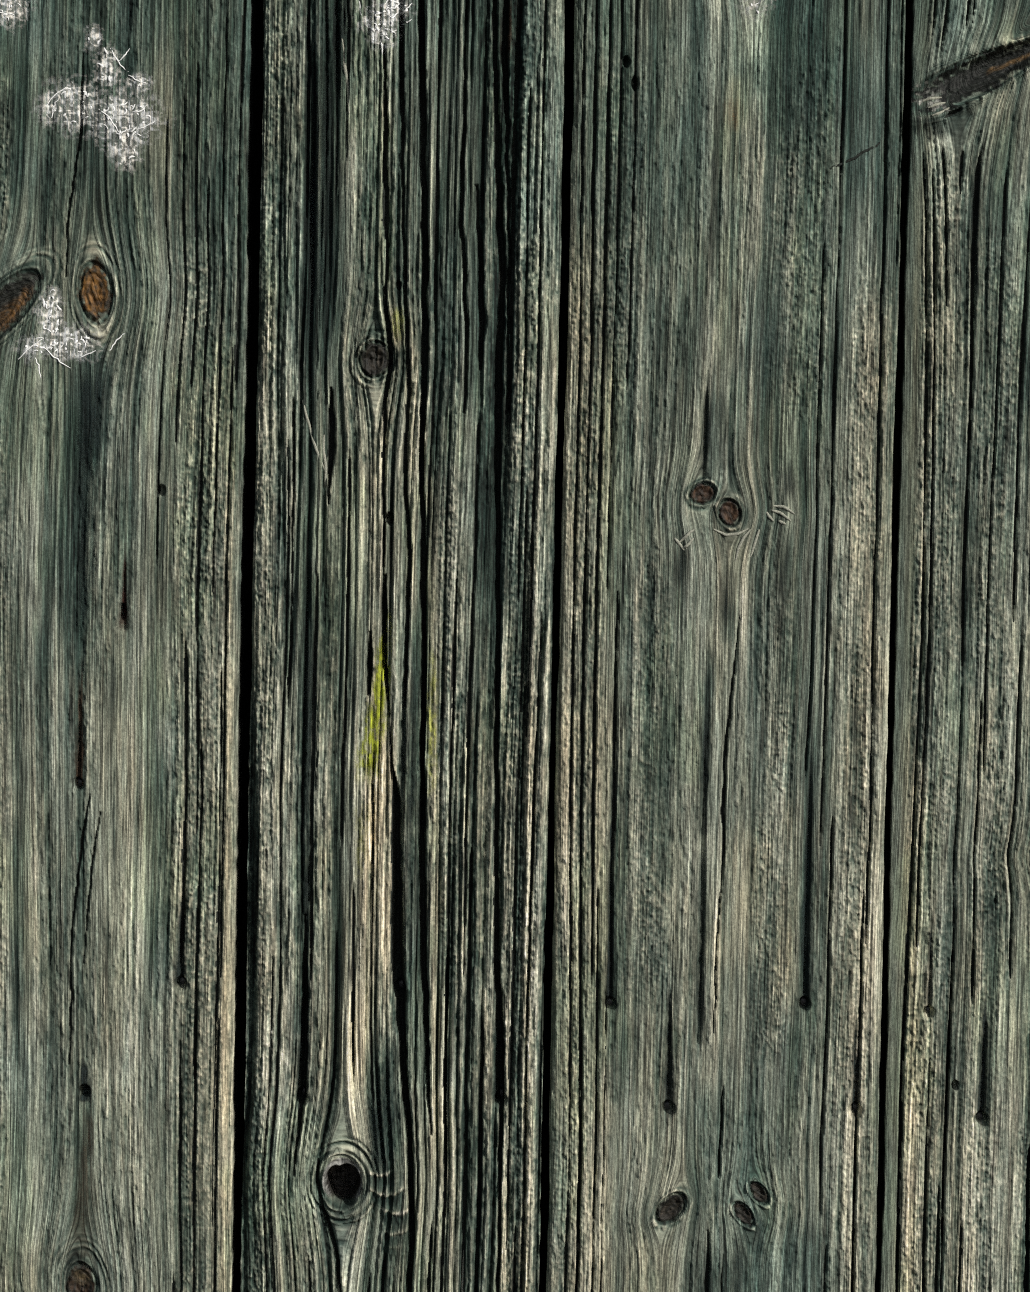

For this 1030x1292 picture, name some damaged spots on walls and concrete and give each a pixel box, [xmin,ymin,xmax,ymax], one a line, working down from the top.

crack [805,0,1030,1292]